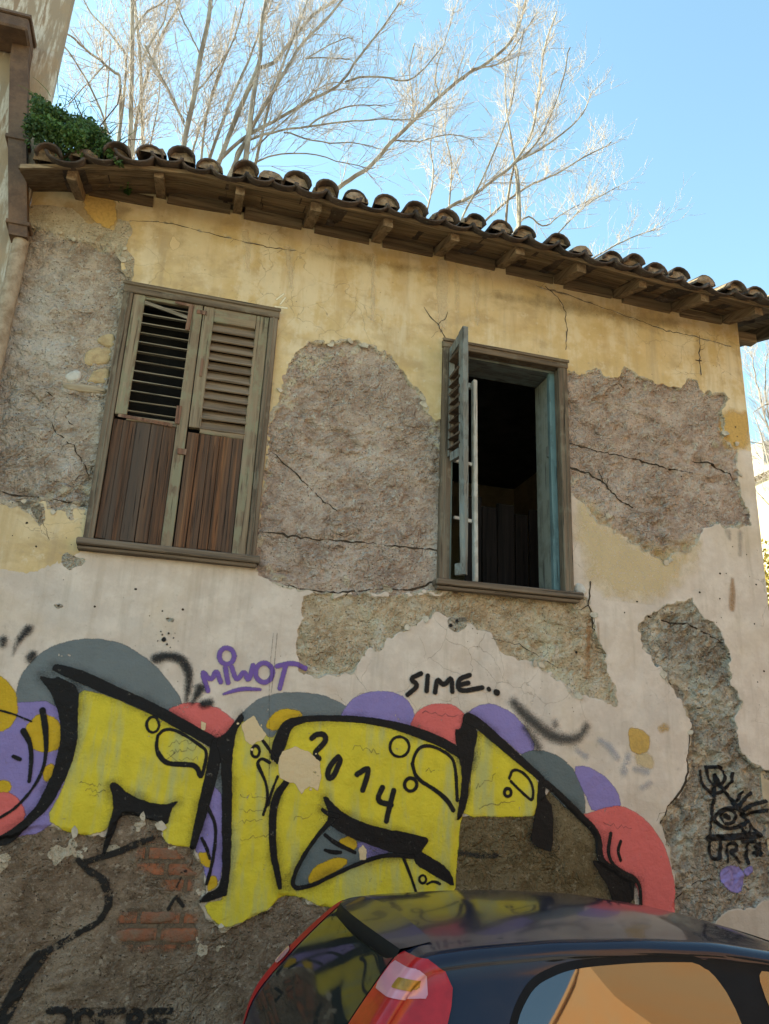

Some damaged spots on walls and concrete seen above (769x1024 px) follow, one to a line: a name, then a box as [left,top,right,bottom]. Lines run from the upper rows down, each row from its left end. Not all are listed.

crack [130,220,296,253]
spalling [0,205,134,526]
crack [535,284,732,375]
crack [45,391,89,476]
crack [272,452,337,511]
crack [264,532,437,551]
spalling [250,338,618,707]
crack [569,443,737,508]
spalling [567,366,751,566]
crack [286,581,432,597]
spalling [638,598,769,923]
spalling [0,811,330,1024]